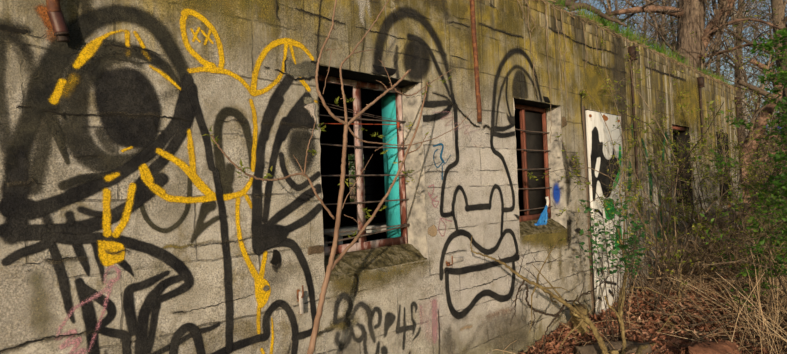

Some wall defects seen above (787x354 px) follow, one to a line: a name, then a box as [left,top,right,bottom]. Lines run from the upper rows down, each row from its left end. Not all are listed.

water stain [358,0,381,26]
water stain [590,36,626,130]
crack [16,105,192,132]
water stain [563,145,581,204]
water stain [547,218,572,271]
crack [0,330,100,354]